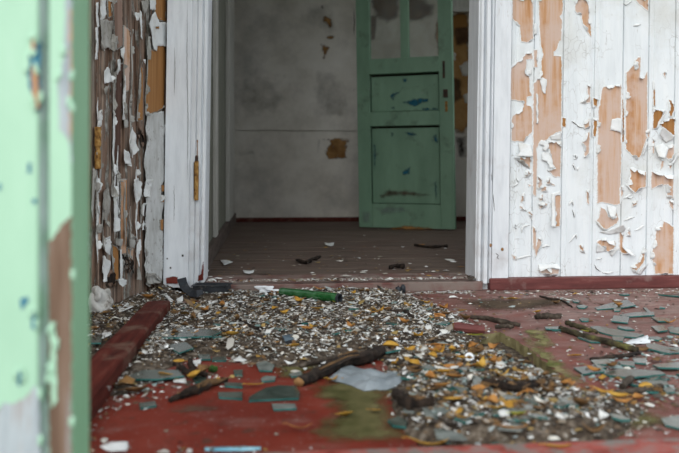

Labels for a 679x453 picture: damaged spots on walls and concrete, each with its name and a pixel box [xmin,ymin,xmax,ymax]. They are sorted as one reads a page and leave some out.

peeling [453,13,469,132]
peeling [574,0,592,37]
peeling [635,0,649,11]
peeling [91,0,167,287]
peeling [326,138,349,159]
peeling [510,0,567,277]
peeling [580,56,679,275]